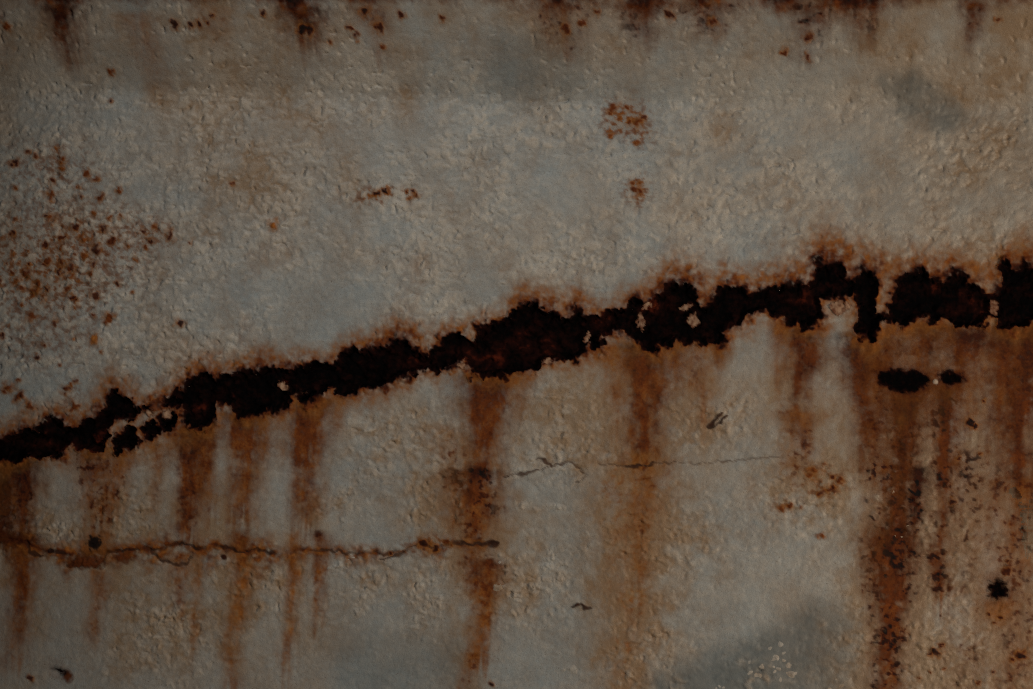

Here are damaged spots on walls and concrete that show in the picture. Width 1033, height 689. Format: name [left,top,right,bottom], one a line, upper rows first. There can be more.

corrosion [274,0,332,46]
corrosion [761,0,903,60]
corrosion [606,103,648,145]
corrosion [0,170,172,321]
corrosion [0,458,38,640]
corrosion [174,412,267,631]
crack [0,531,499,574]
corrosion [291,396,340,602]
corrosion [443,372,520,682]
corrosion [608,340,681,575]
corrosion [774,322,844,497]
corrosion [842,323,1033,689]